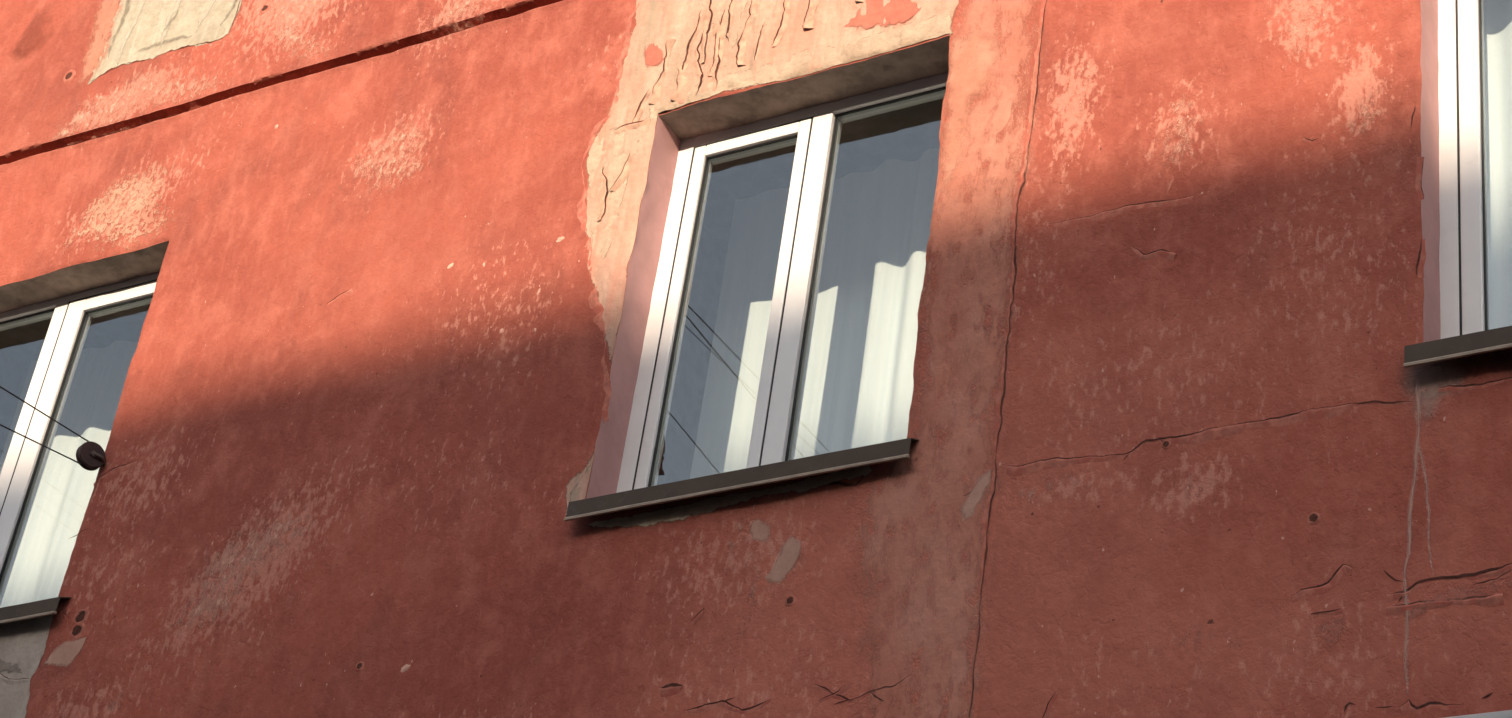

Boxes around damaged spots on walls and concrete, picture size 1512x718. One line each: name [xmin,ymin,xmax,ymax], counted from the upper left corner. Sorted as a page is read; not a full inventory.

spalling [59,0,241,138]
spalling [0,615,86,718]
peeling [565,453,594,514]
peeling [577,0,1033,718]
crack [963,0,1512,718]
water stain [1404,381,1429,678]